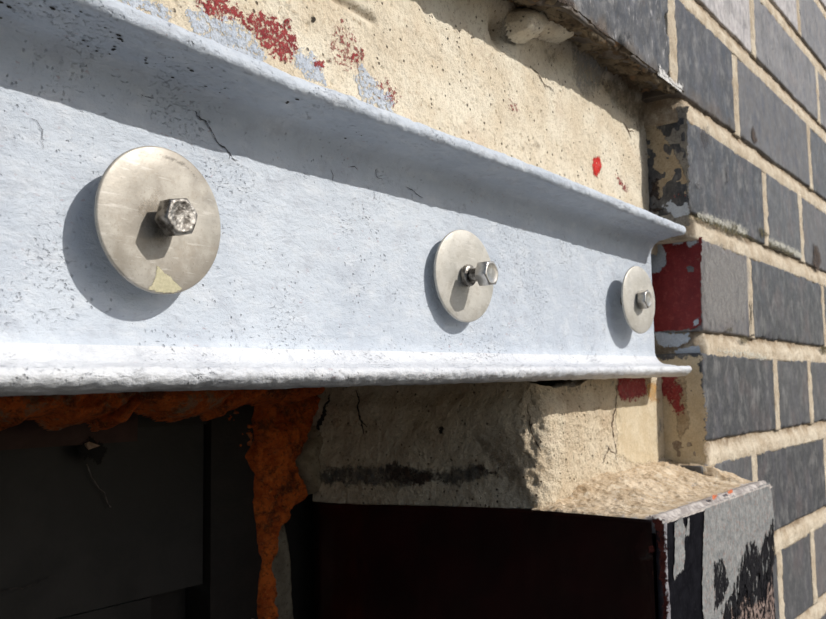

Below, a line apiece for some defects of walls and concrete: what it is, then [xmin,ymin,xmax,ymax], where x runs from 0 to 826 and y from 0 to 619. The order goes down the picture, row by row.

peeling [197,0,299,62]
peeling [314,19,401,112]
crack [195,111,238,161]
peeling [651,244,667,273]
crack [316,394,330,430]
crack [602,386,618,464]
damp [320,461,499,487]
peeling [673,518,690,579]
peeling [702,483,776,619]